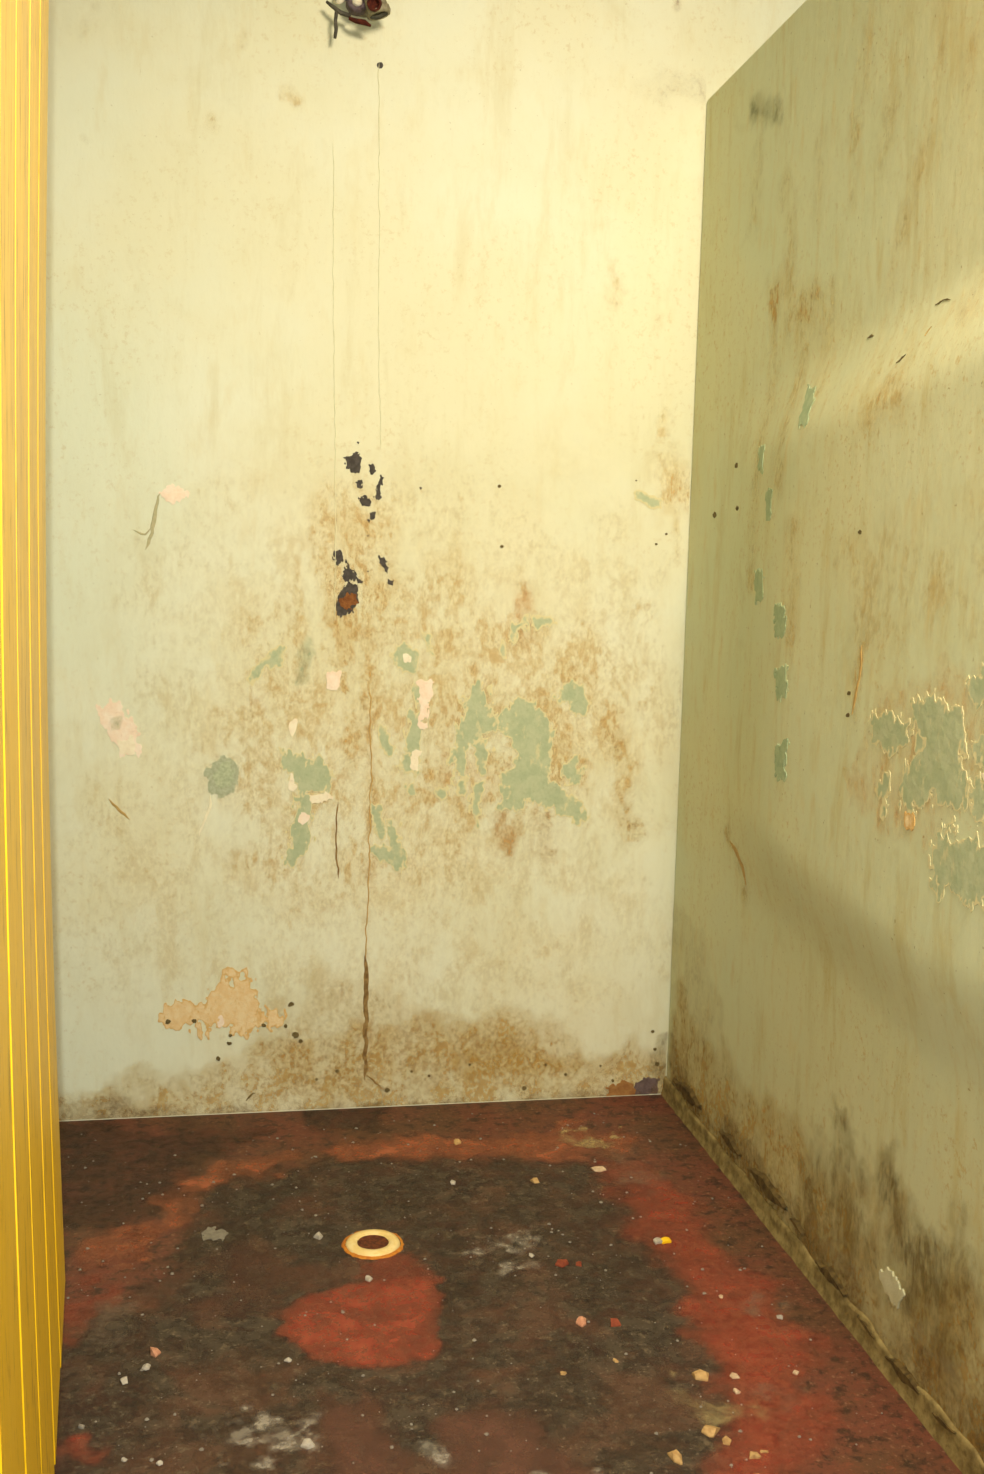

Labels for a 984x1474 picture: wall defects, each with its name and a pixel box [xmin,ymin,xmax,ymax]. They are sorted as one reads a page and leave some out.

spalling [343,442,384,536]
spalling [332,550,394,618]
spalling [754,568,787,639]
peeling [326,670,342,690]
peeling [373,632,592,829]
spalling [198,755,239,835]
peeling [278,718,336,869]
peeling [369,803,408,874]
peeling [868,662,984,913]
peeling [158,967,303,1061]
water stain [54,1015,876,1474]
water stain [898,1285,984,1463]